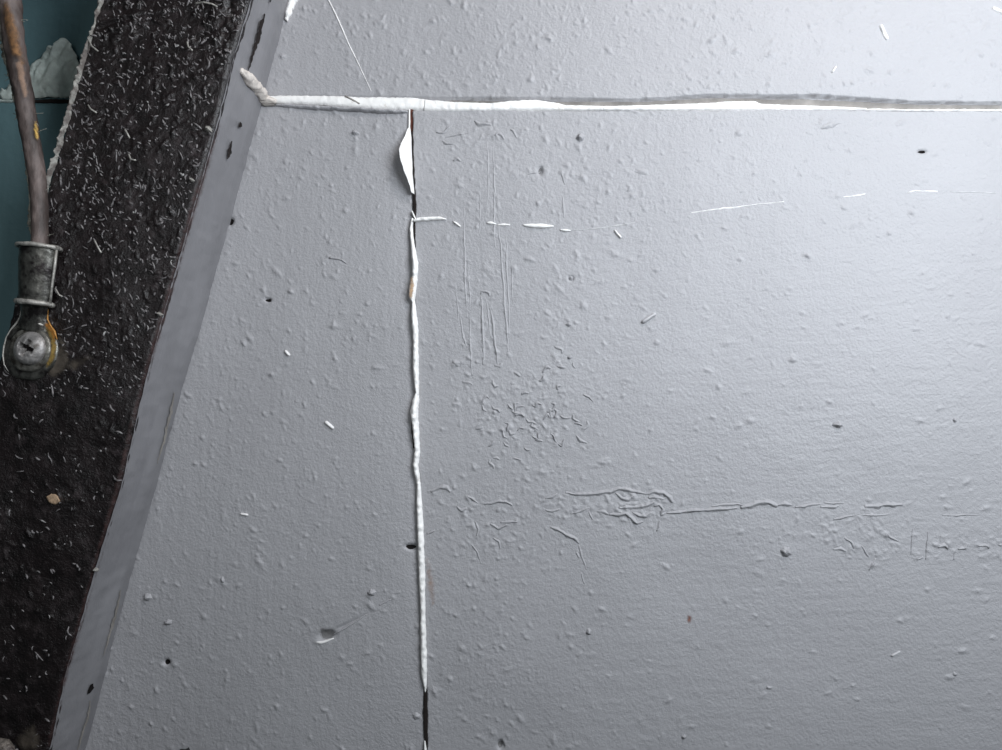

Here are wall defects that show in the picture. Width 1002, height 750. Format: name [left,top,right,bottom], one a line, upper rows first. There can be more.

peeling [0,84,13,100]
peeling [30,38,79,99]
crack [240,68,1002,750]